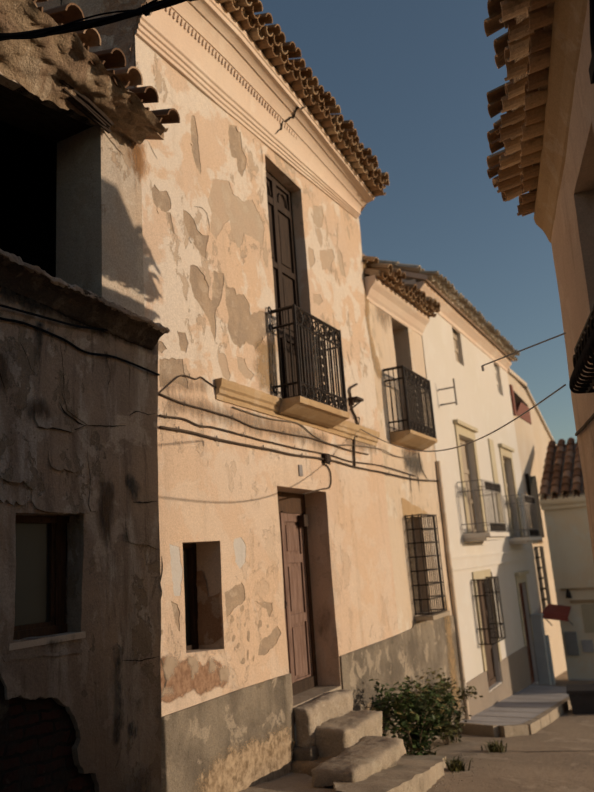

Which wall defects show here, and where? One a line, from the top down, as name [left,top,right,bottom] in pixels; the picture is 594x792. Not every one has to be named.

peeling [190,115,201,173]
peeling [228,125,246,176]
crack [260,106,306,162]
peeling [152,185,174,233]
peeling [183,179,264,258]
peeling [308,247,345,276]
peeling [189,265,268,380]
peeling [158,332,188,389]
peeling [169,544,182,630]
spalling [160,570,281,702]
flaking render [0,680,95,792]